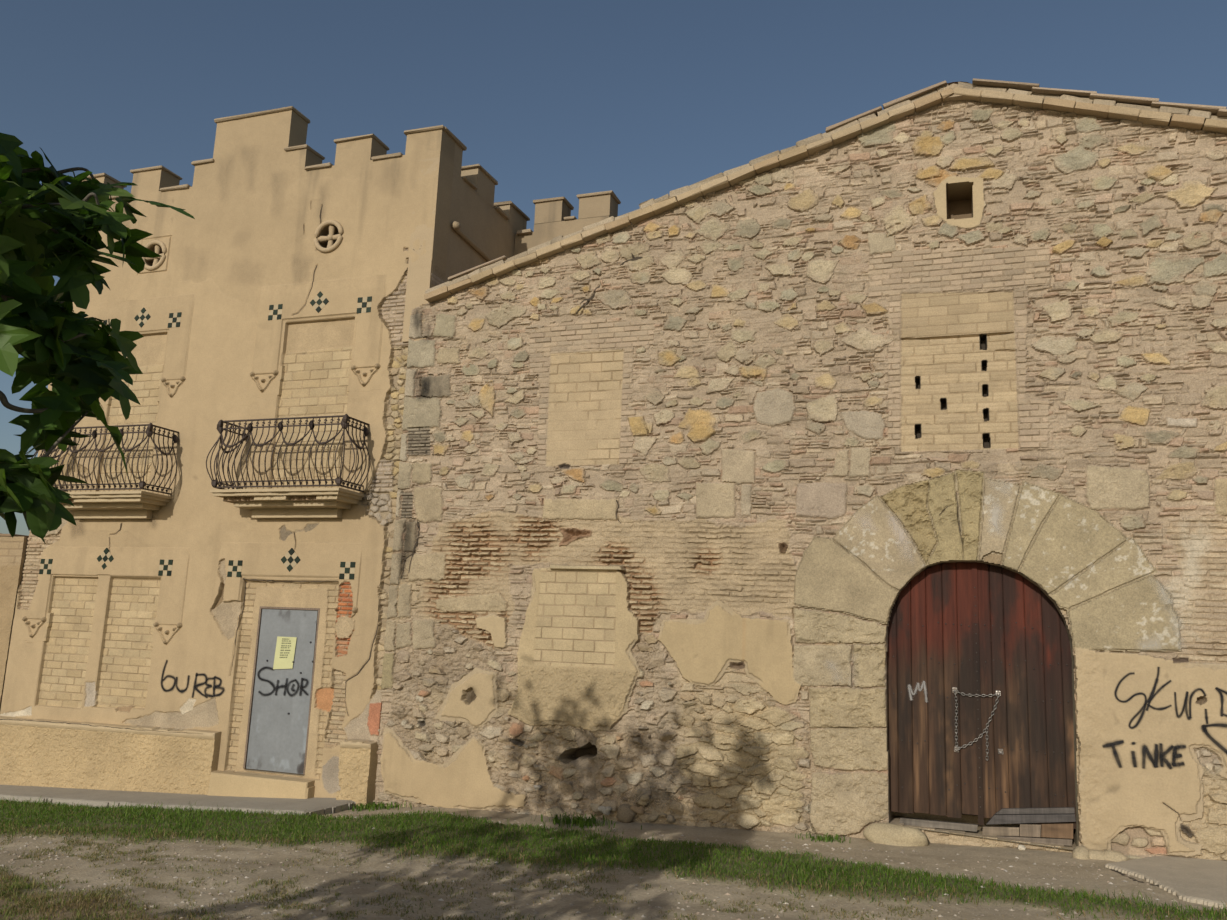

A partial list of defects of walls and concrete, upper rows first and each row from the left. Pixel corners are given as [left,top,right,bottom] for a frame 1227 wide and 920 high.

flaking render [431,263,446,286]
flaking render [212,559,244,639]
spalling [316,272,802,810]
flaking render [1074,646,1227,857]